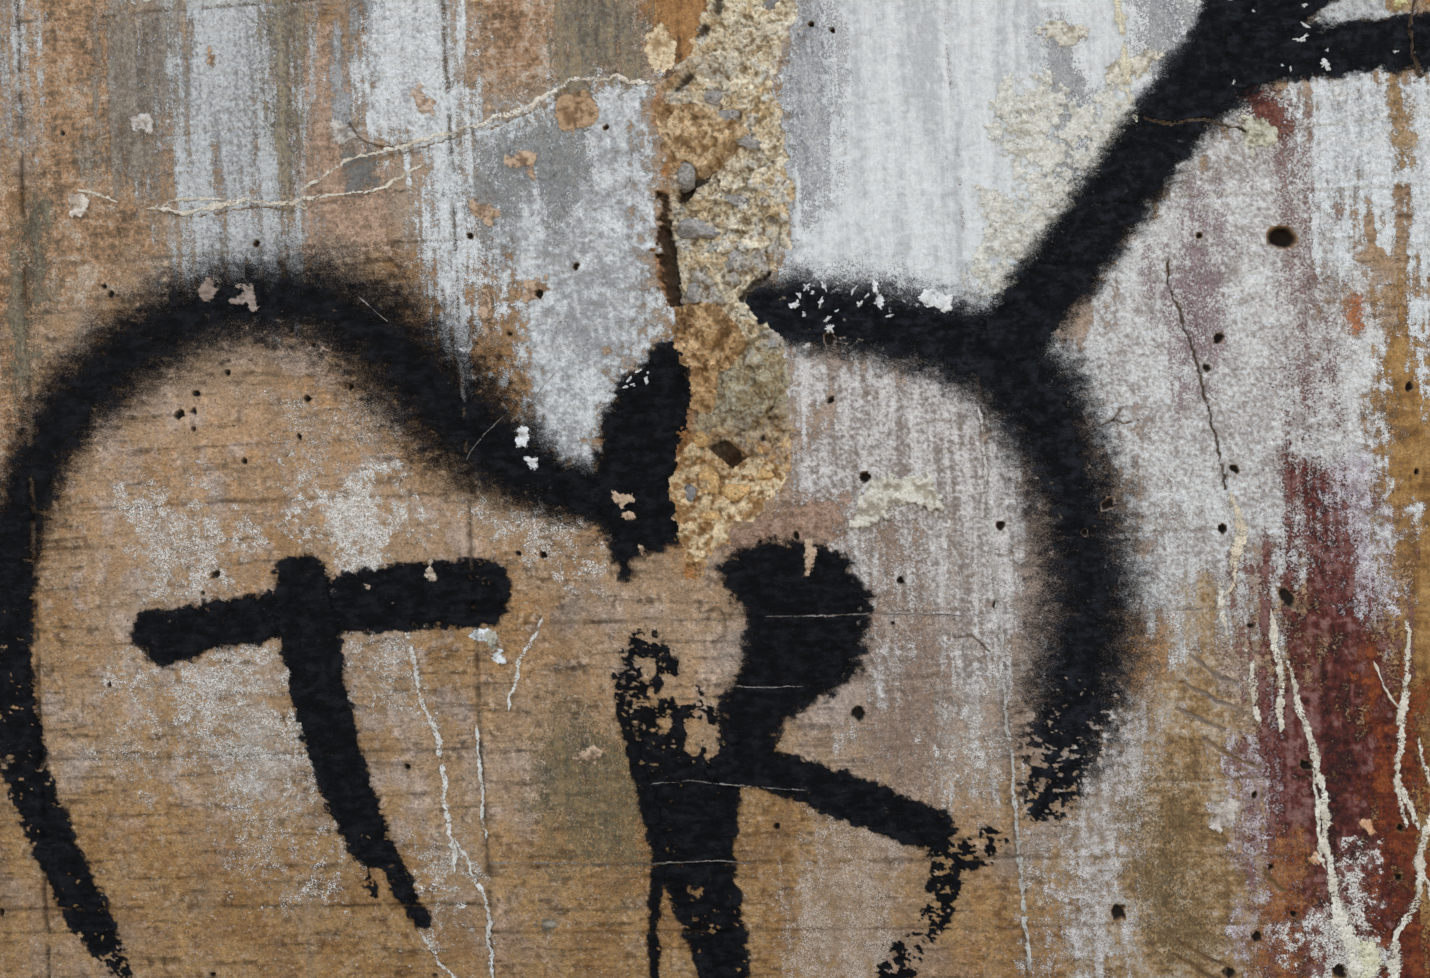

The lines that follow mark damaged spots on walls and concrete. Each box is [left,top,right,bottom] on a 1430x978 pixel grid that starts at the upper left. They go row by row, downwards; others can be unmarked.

rust [1385,0,1430,15]
crack [77,73,658,218]
spalling [644,0,802,580]
peeling [788,281,839,333]
crack [1166,260,1227,490]
rust [1018,71,1430,978]